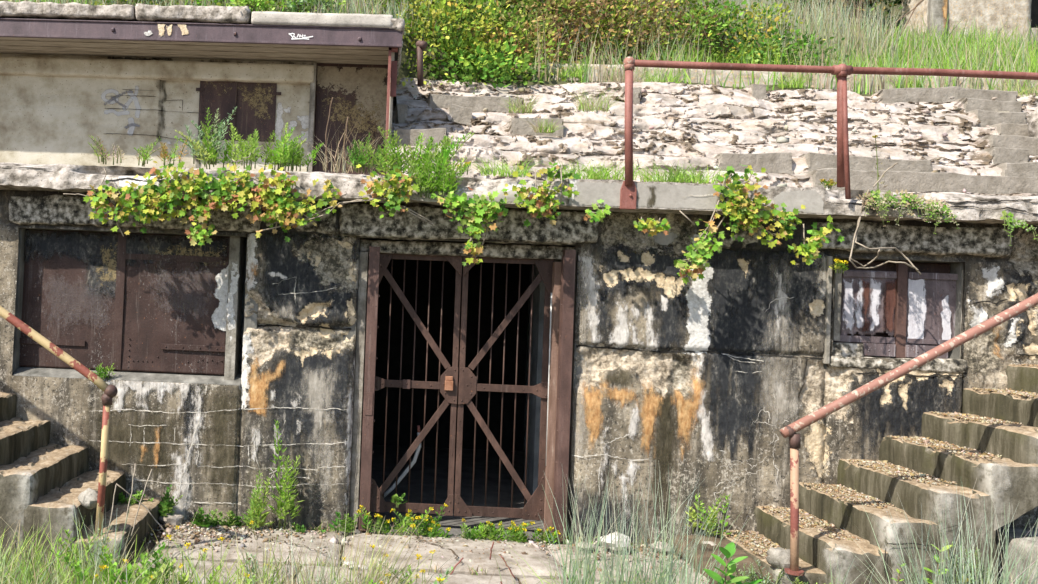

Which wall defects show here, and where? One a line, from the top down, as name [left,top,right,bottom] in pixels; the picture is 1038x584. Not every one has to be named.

spalling [569,180,717,299]
leakage [87,347,355,524]
rust [246,358,285,415]
spalling [211,229,359,410]
leakage [574,389,586,458]
rust [584,369,702,458]
leakage [578,234,835,461]
spalling [799,355,863,427]
peeling [842,278,881,331]
leakage [851,369,964,459]
spalling [877,226,1038,408]
leakage [825,549,839,567]